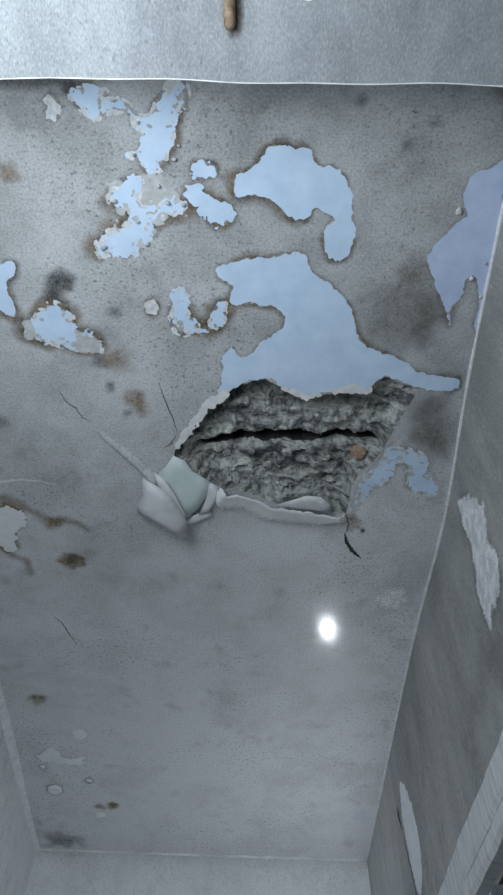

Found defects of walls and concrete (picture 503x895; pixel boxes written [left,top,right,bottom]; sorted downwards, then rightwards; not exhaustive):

peeling [43,80,356,266]
peeling [427,160,503,331]
peeling [0,261,106,354]
spalling [136,252,460,537]
peeling [0,498,31,553]
rust [60,555,85,569]
crack [344,518,361,558]
peeling [457,493,500,630]
peeling [397,781,422,895]